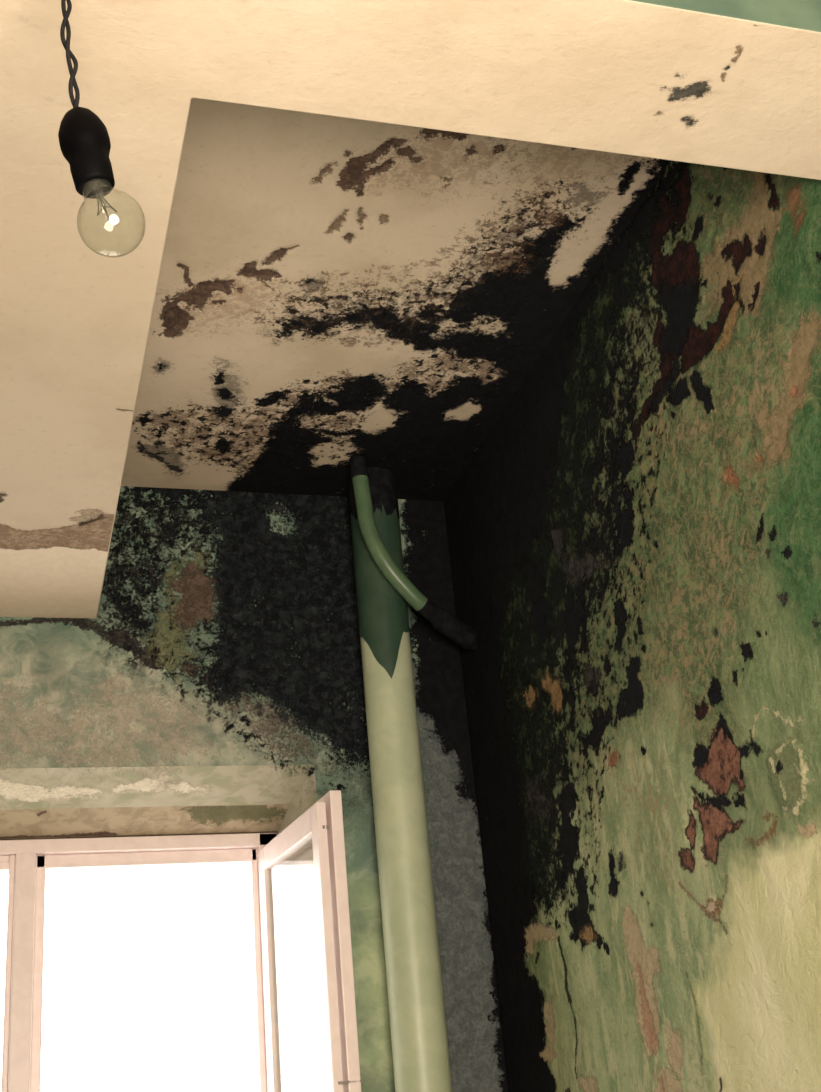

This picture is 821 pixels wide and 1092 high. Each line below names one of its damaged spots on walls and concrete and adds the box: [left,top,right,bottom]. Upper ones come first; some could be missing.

flaking render [662,75,711,102]
flaking render [158,301,222,338]
flaking render [0,509,114,552]
water stain [756,513,792,559]
water stain [0,158,714,1092]
flaking render [678,710,763,873]
crack [535,936,578,1092]
peeling [621,903,661,1059]